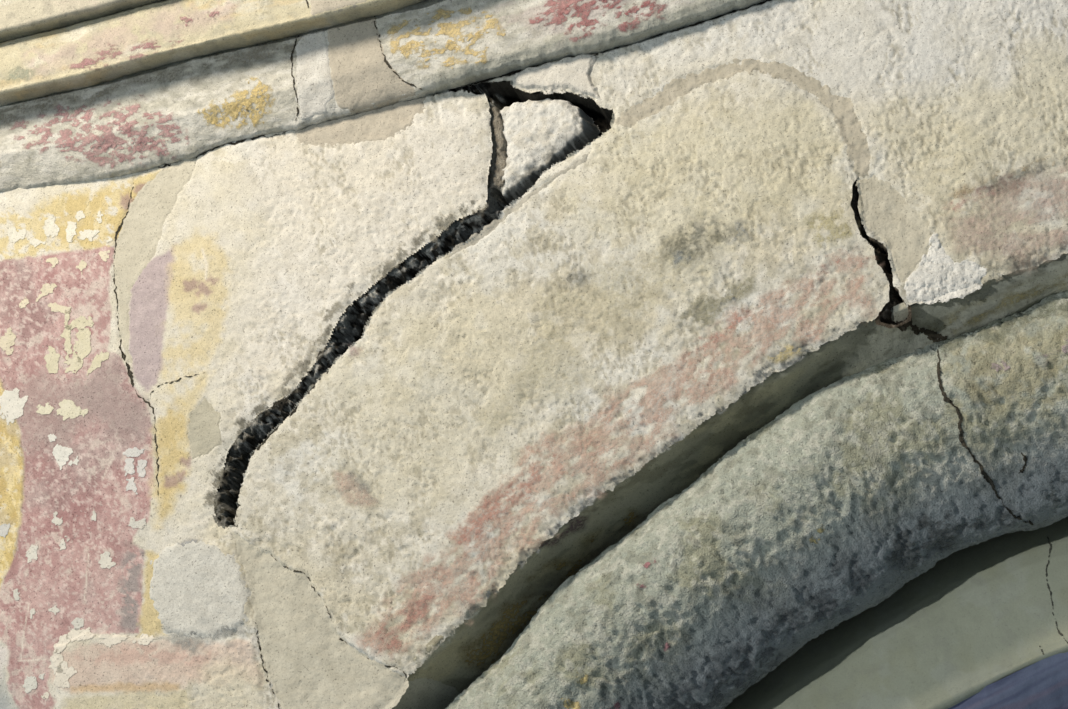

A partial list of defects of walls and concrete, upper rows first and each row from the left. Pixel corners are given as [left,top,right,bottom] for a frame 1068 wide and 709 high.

peeling [530,0,666,41]
crack [594,0,771,56]
peeling [450,54,602,257]
peeling [8,210,112,262]
crack [196,16,613,529]
spalling [904,233,987,305]
peeling [19,283,109,376]
crack [113,164,205,498]
peeling [0,388,88,425]
peeling [48,434,79,470]
crack [851,179,1068,655]
peeling [23,617,156,699]